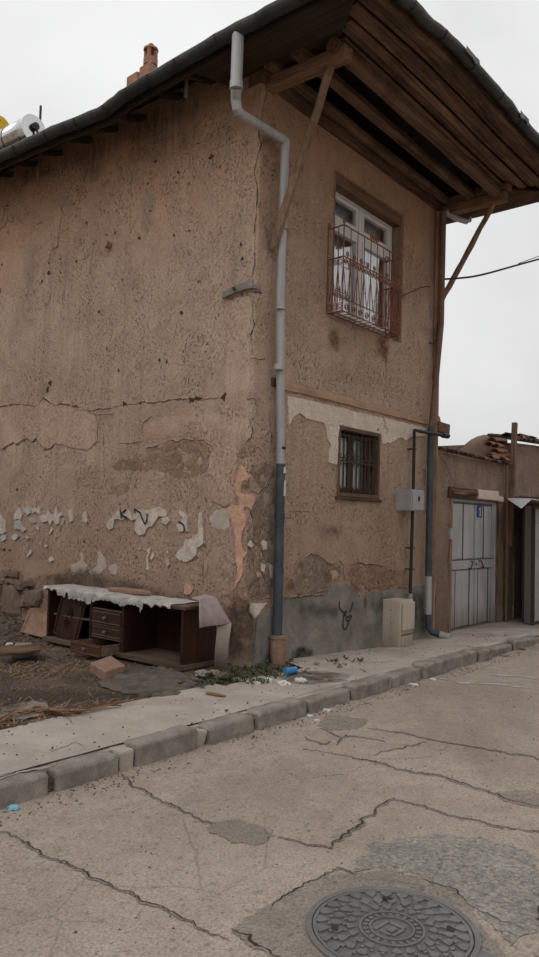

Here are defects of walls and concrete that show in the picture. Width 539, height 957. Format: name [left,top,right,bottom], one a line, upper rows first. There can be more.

crack [0,390,219,475]
peeling [287,396,427,465]
peeling [0,507,88,562]
flaking render [106,441,276,619]
spalling [0,540,119,620]
crack [121,774,211,823]
crack [303,728,539,807]
crack [272,797,539,907]
crack [0,831,280,957]